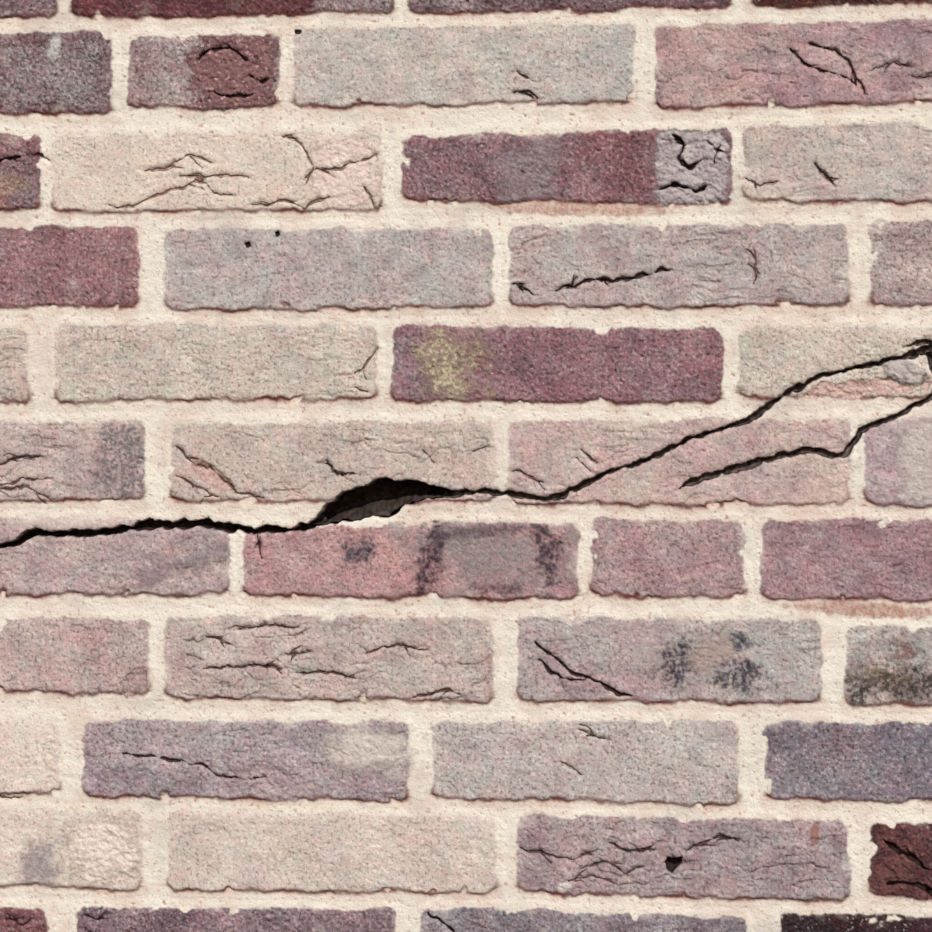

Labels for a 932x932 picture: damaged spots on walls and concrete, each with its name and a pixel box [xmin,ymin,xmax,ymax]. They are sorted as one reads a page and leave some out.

crack [0,340,932,558]